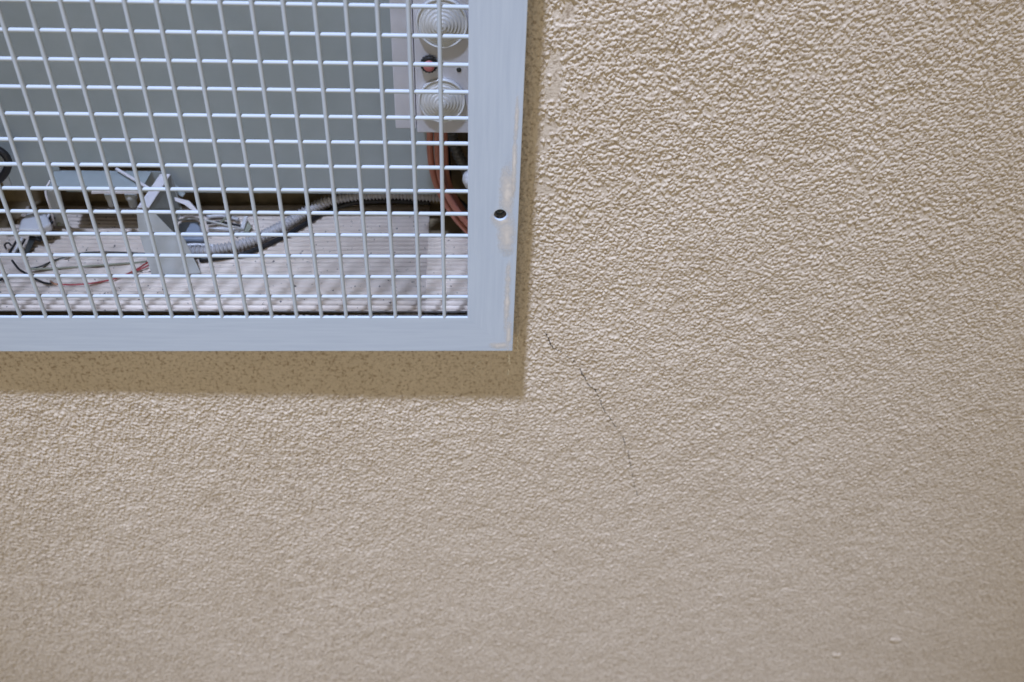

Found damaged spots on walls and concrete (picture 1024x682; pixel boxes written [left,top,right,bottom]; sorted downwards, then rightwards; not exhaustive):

crack [545,333,639,501]